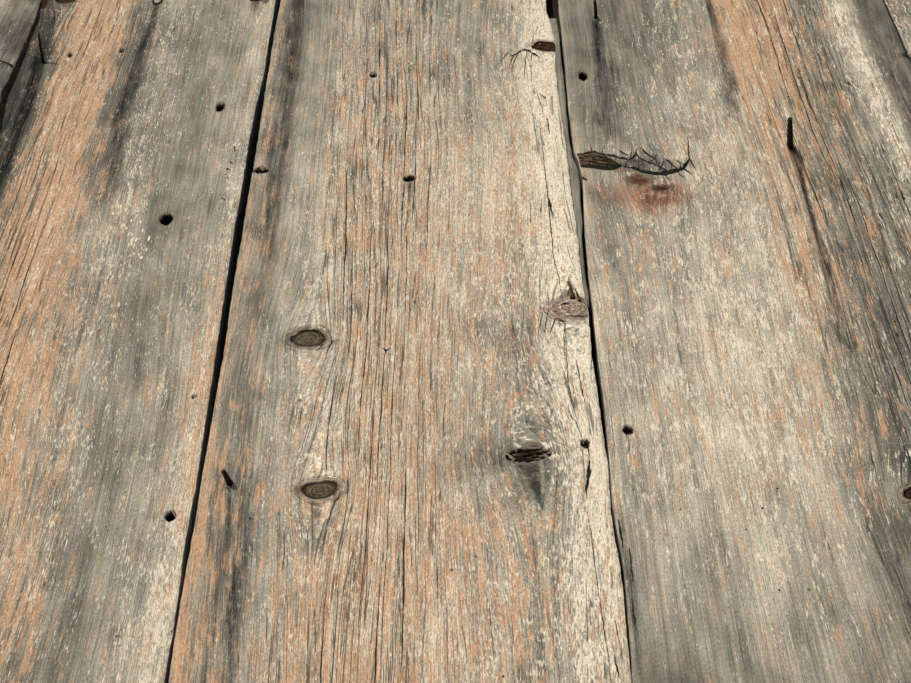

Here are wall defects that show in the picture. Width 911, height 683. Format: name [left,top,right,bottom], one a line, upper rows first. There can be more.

crack [501,49,636,682]
crack [577,138,695,181]
crack [757,0,911,412]